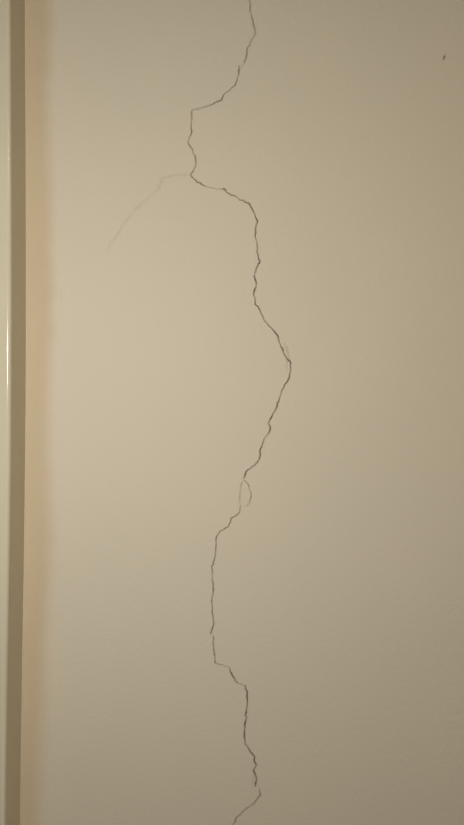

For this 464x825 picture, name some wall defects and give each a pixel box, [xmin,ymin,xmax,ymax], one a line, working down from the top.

crack [188,118,199,167]
crack [249,204,263,308]
crack [245,331,291,474]
crack [244,690,259,786]